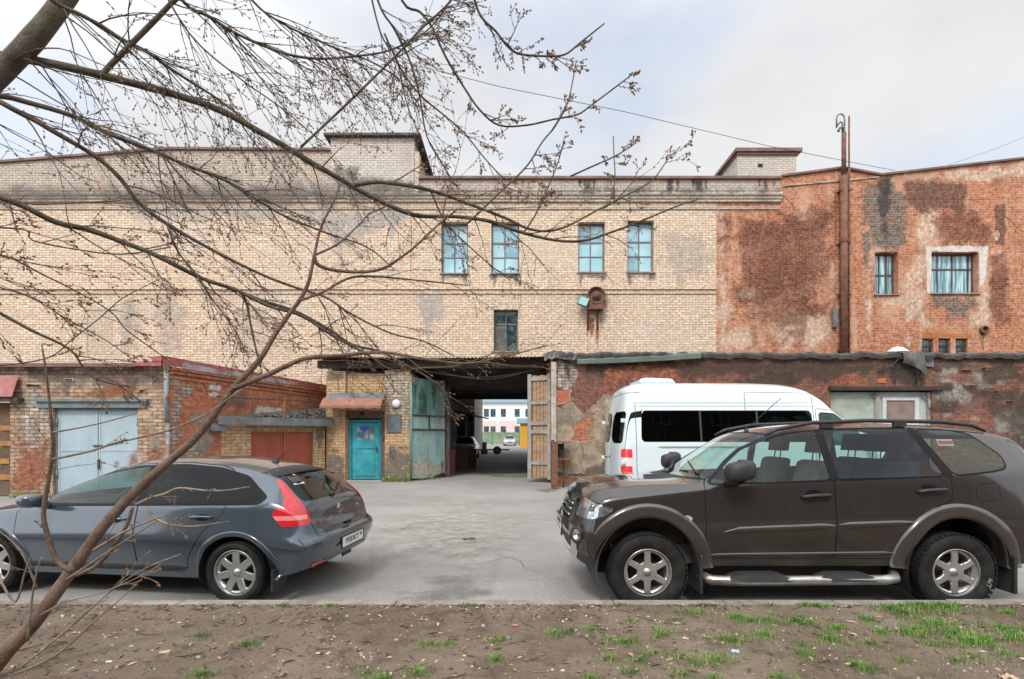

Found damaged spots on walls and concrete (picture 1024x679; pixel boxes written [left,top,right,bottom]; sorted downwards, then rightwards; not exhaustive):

damp [715,207,839,352]
damp [863,161,1024,350]
peeling [556,360,578,405]
flaking render [569,410,601,443]